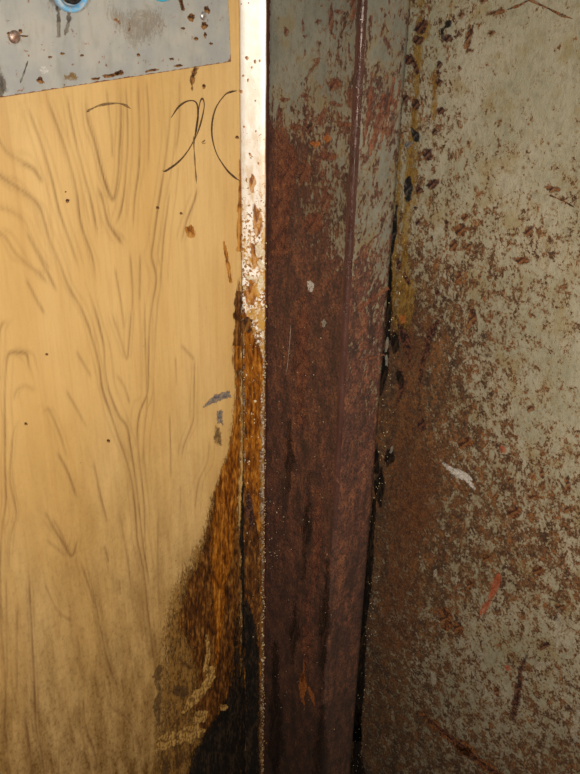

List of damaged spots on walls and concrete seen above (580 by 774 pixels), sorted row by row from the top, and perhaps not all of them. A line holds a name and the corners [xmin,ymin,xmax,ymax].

rust [464,23,475,52]
rust [276,97,343,146]
rust [250,205,262,269]
rust [357,18,445,431]
rust [444,214,473,251]
peeling [244,241,267,293]
rust [467,309,477,327]